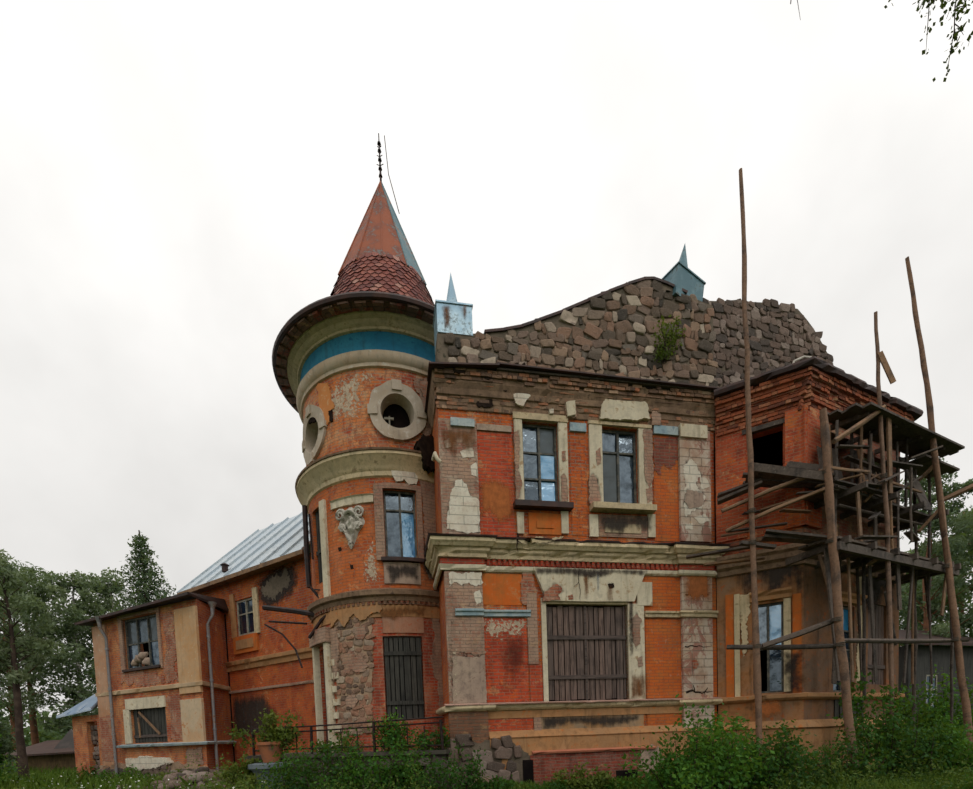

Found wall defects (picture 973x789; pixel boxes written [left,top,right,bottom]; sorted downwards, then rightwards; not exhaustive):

flaking render [308,371,374,426]
flaking render [548,400,577,420]
peeling [391,378,512,579]
flaking render [598,399,710,530]
flaking render [542,584,573,602]
flaking render [329,601,382,641]
spalling [430,571,527,707]